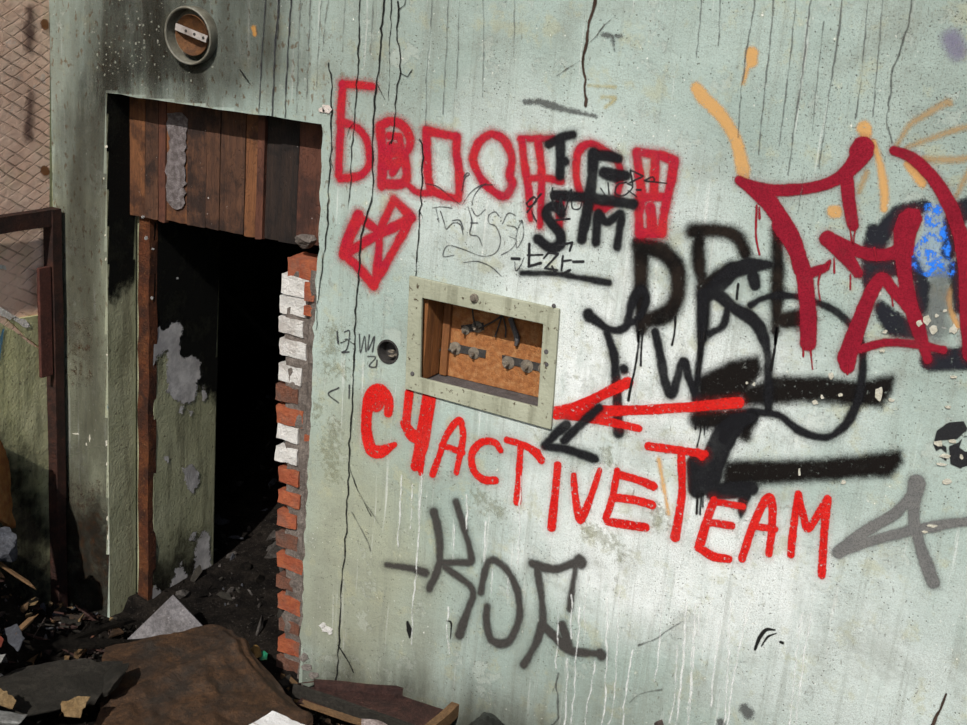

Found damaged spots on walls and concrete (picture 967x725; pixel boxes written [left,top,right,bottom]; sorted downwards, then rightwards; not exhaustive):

crack [557,0,616,107]
peeling [153,322,207,416]
flaking render [274,234,319,679]
crack [316,0,412,680]